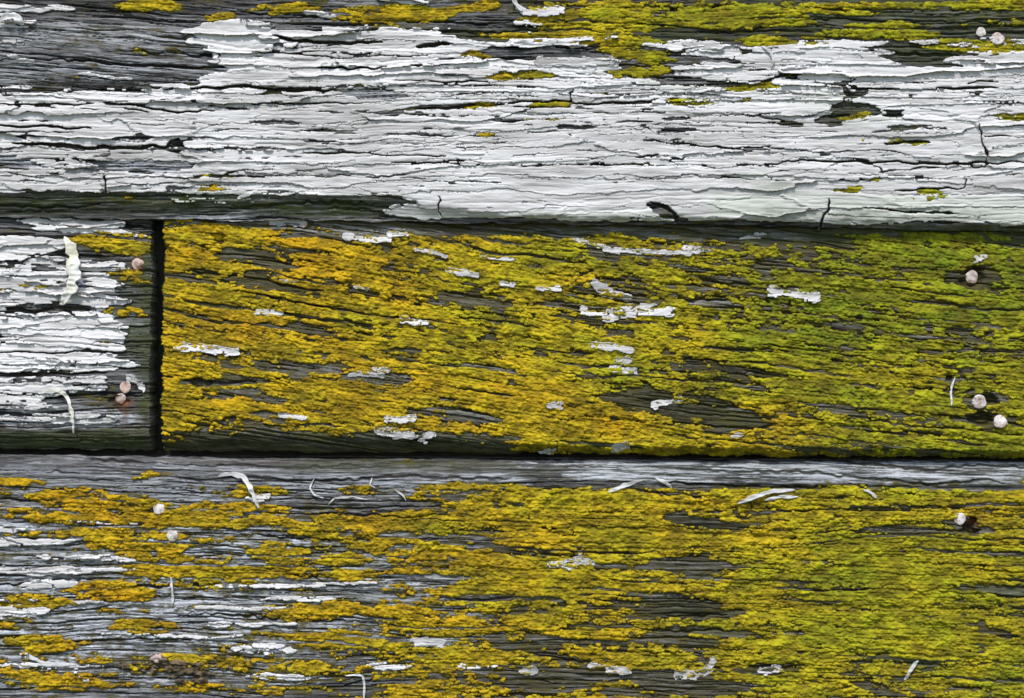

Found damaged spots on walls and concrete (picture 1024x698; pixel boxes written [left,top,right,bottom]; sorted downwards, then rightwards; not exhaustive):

peeling [0,4,1024,243]
crack [636,125,1024,213]
crack [818,199,830,231]
peeling [0,217,147,425]
peeling [579,279,676,323]
peeling [767,285,821,304]
peeling [173,341,240,357]
peeling [590,341,638,375]
peeling [374,414,437,445]
peeling [0,526,136,620]
peeling [101,581,386,656]
peeling [0,653,104,682]